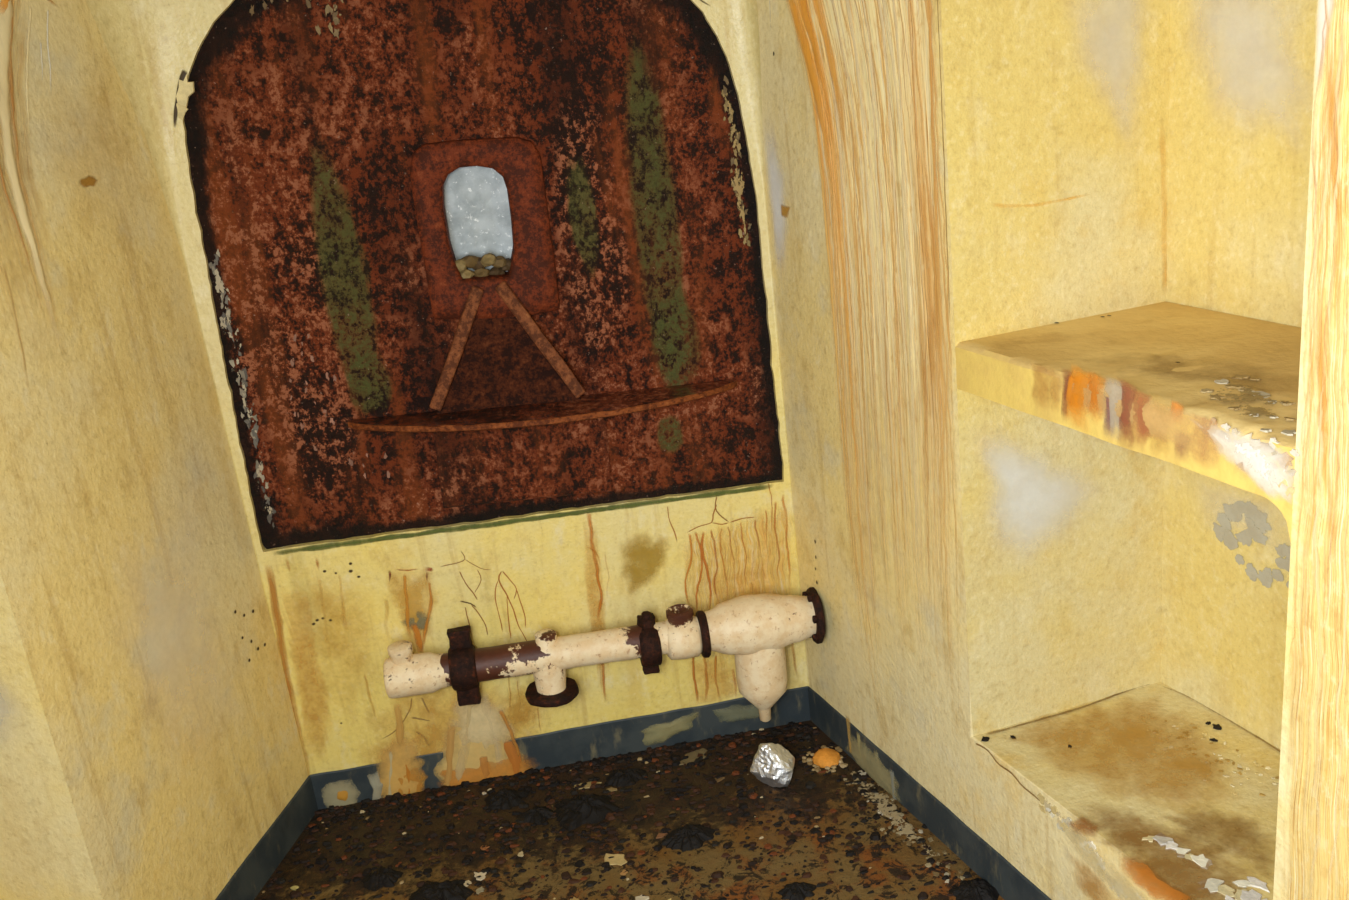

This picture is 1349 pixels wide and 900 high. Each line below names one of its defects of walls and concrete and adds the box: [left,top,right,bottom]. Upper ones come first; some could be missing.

rust [1053,371,1209,454]
spalling [1200,375,1300,497]
water stain [626,541,663,588]
crack [667,497,754,540]
rust [684,484,790,611]
rust [692,656,717,696]
spalling [1037,793,1144,900]
peeling [1142,835,1270,900]